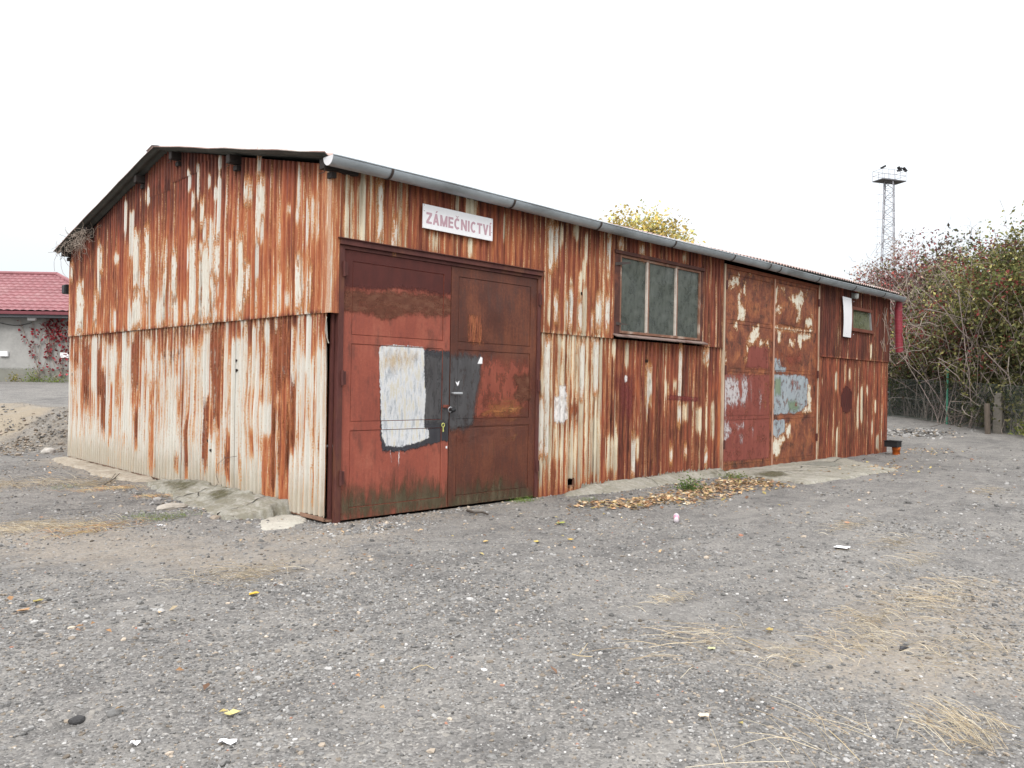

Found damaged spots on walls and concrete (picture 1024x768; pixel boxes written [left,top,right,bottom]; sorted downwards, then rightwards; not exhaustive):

corrosion [344,249,451,320]
peeling [728,272,813,363]
corrosion [74,342,106,431]
corrosion [131,337,139,390]
corrosion [175,420,188,474]
corrosion [202,323,224,467]
corrosion [270,318,295,490]
corrosion [569,397,578,428]
peeling [802,384,812,415]
corrosion [841,386,852,413]